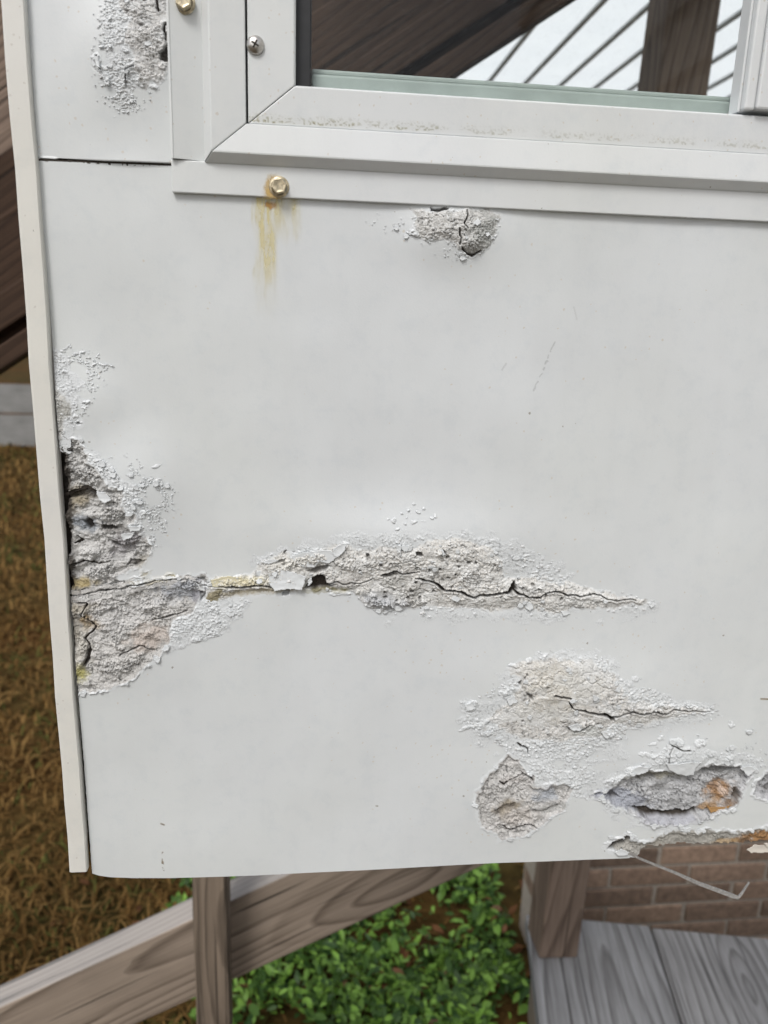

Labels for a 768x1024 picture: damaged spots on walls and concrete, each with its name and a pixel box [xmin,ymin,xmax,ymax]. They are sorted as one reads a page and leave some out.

peeling [90,0,168,118]
rust [257,177,276,247]
spalling [365,205,504,262]
peeling [53,344,660,697]
peeling [455,647,768,858]